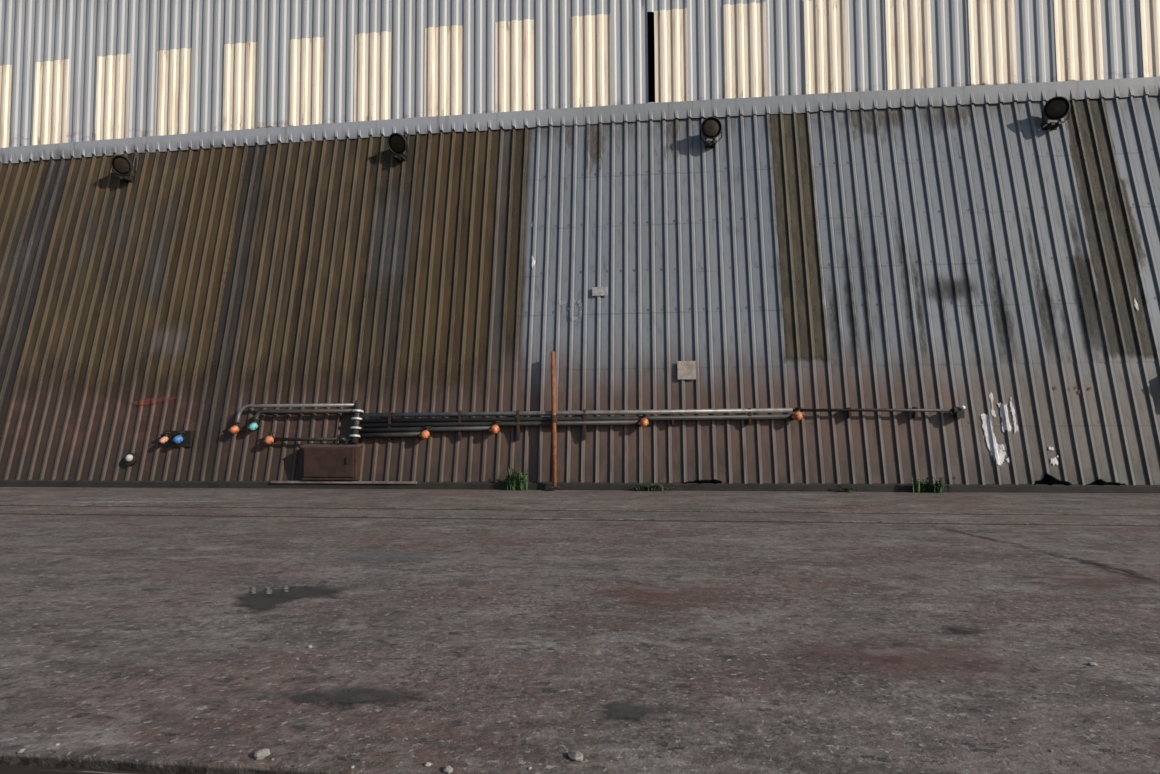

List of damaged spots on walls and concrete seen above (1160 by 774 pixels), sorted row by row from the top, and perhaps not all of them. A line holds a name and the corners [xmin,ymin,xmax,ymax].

damp [830,241,881,345]
damp [899,246,927,352]
damp [963,264,974,333]
damp [989,255,1013,346]
damp [237,586,340,612]